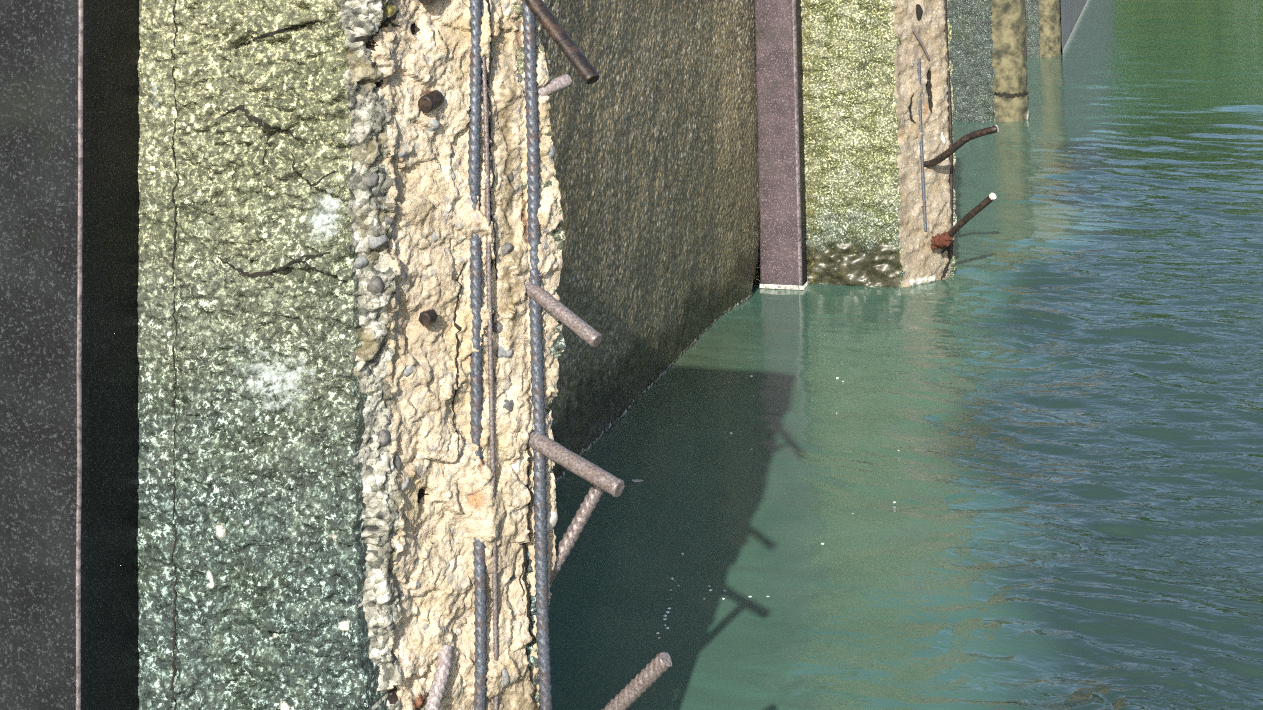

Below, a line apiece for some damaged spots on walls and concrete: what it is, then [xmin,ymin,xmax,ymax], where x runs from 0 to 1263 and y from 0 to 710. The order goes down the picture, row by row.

spalling [338,0,565,710]
spalling [893,0,956,288]
rust [931,232,954,250]
rust [413,695,427,710]